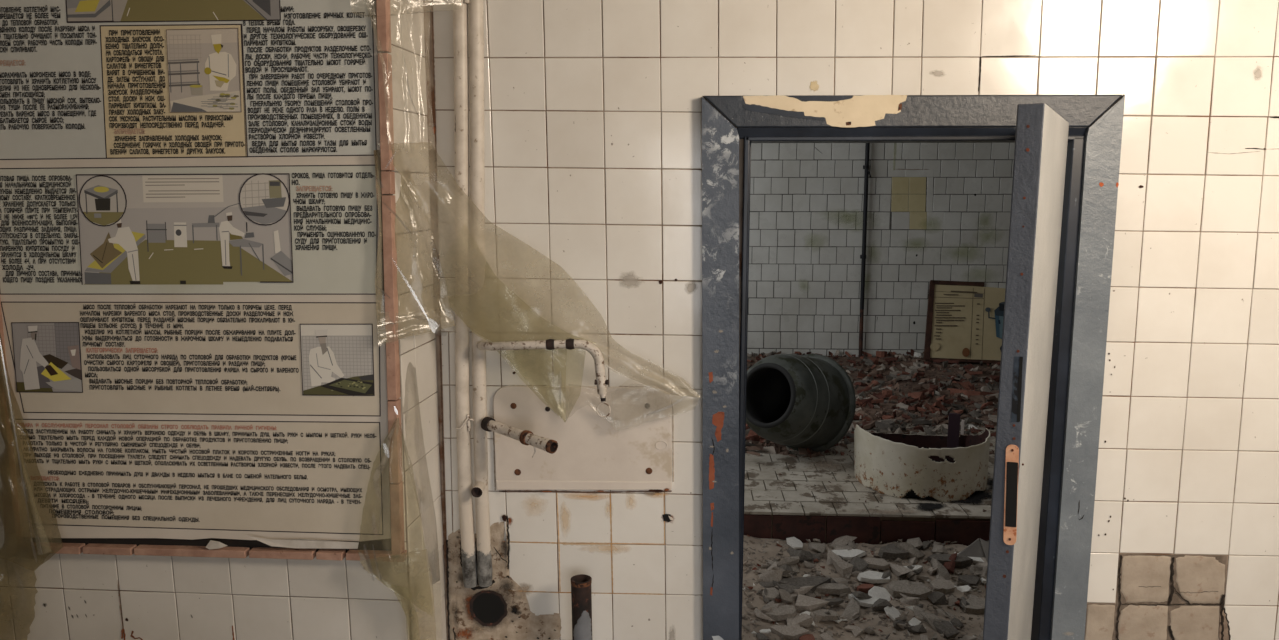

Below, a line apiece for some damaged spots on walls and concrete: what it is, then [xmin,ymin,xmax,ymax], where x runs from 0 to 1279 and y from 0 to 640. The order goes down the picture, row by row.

peeling [743,95,907,127]
peeling [709,406,728,595]
corrosion [118,583,143,640]
flaking render [446,515,592,640]
spalling [1084,554,1231,640]